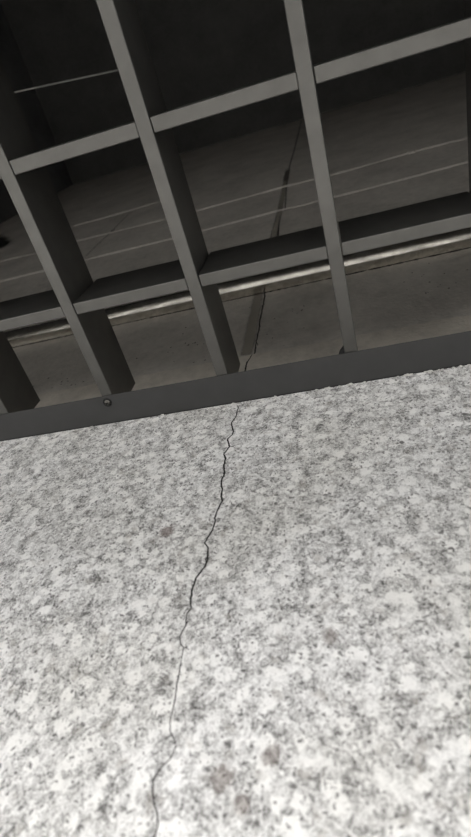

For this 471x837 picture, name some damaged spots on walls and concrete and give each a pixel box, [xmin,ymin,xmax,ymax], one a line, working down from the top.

crack [152,407,239,837]